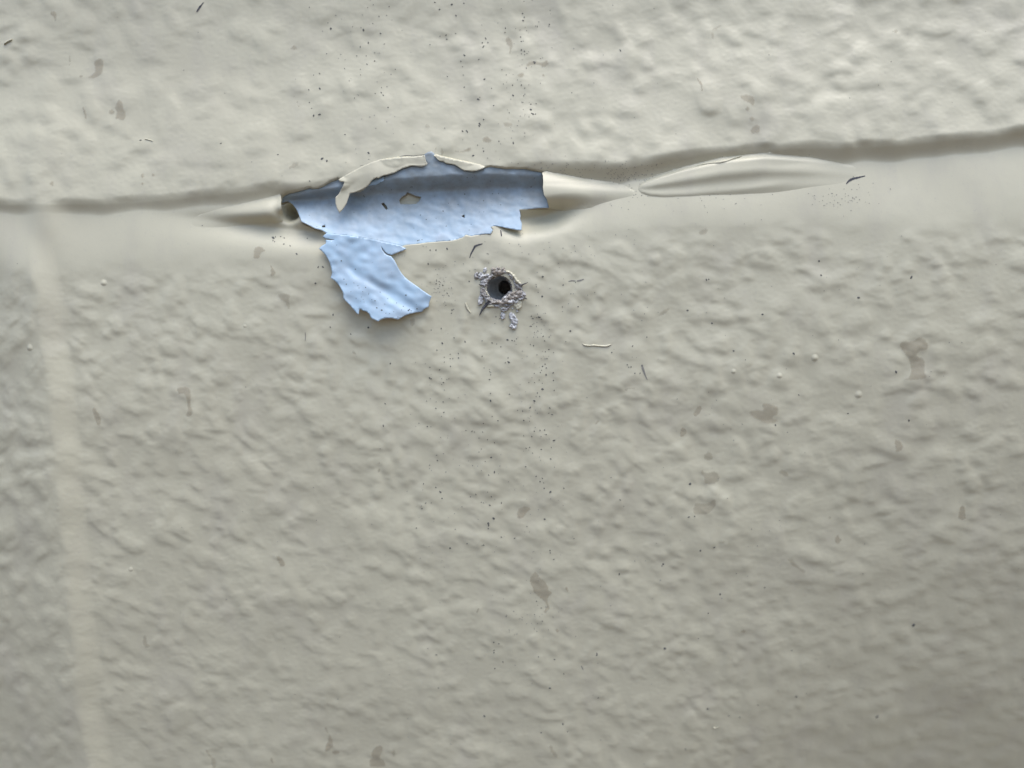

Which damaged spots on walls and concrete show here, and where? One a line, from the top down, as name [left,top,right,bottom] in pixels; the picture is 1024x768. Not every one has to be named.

peeling [282,151,549,330]